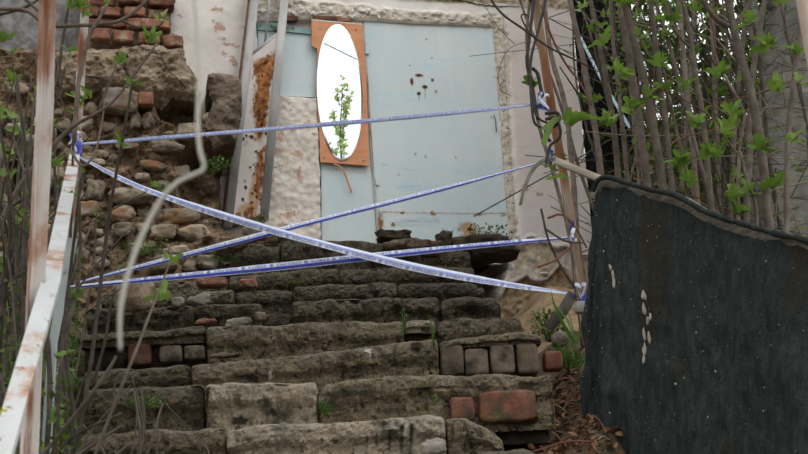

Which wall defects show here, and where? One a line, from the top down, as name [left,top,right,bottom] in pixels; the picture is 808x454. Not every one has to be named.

peeling [211,7,239,66]
rust [236,54,275,218]